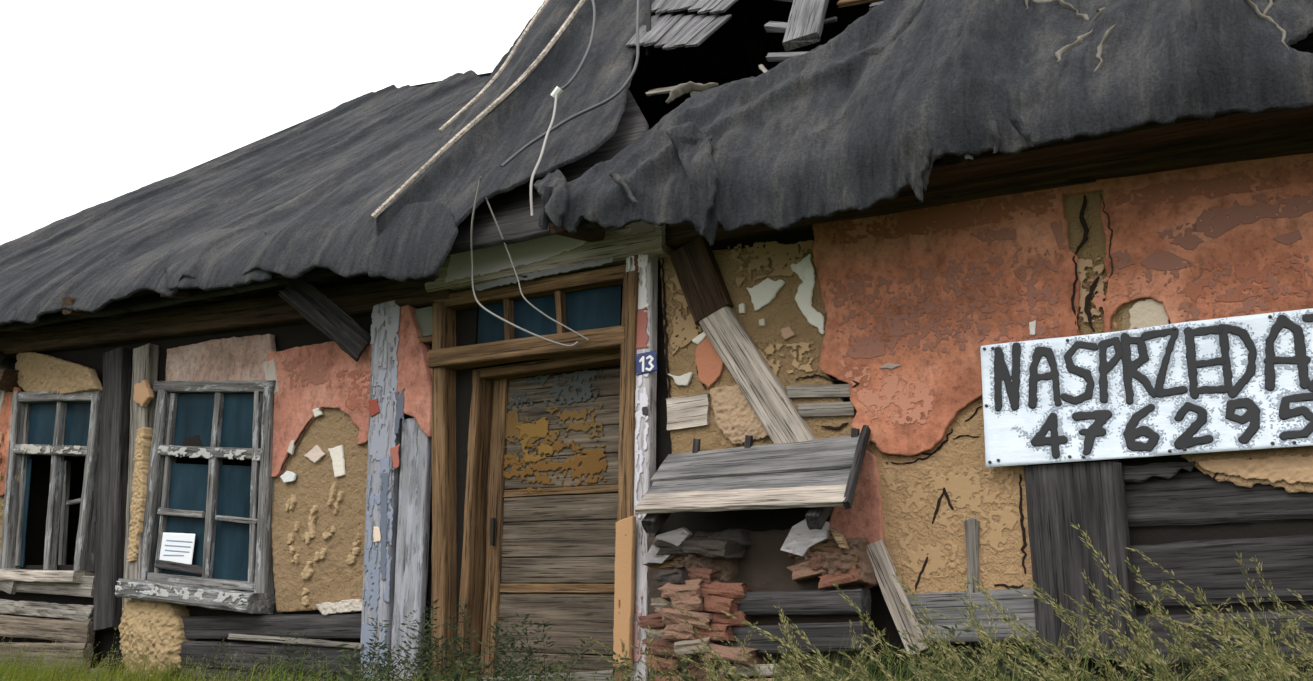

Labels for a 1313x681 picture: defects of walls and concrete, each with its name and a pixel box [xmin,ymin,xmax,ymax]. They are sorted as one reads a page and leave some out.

crack [1071,193,1113,333]
peeling [14,444,87,454]
peeling [133,380,154,407]
peeling [127,427,262,562]
peeling [263,359,279,394]
flaking render [271,305,405,681]
peeling [492,369,608,494]
peeling [613,373,649,666]
flaking render [628,252,774,454]
flaking render [712,245,1033,595]
peeling [1180,446,1313,493]
peeling [115,581,247,605]